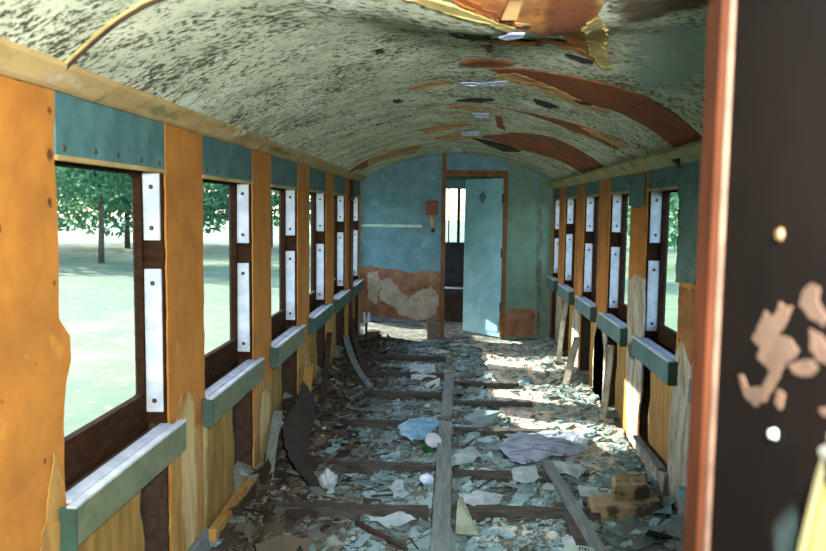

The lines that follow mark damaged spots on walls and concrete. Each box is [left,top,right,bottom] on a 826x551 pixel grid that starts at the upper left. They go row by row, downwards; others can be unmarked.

peeling [478,33,586,54]
peeling [422,105,632,173]
peeling [408,68,702,148]
peeling [360,265,441,322]
flaking render [667,160,701,508]
peeling [738,283,826,410]
peeling [40,453,65,551]